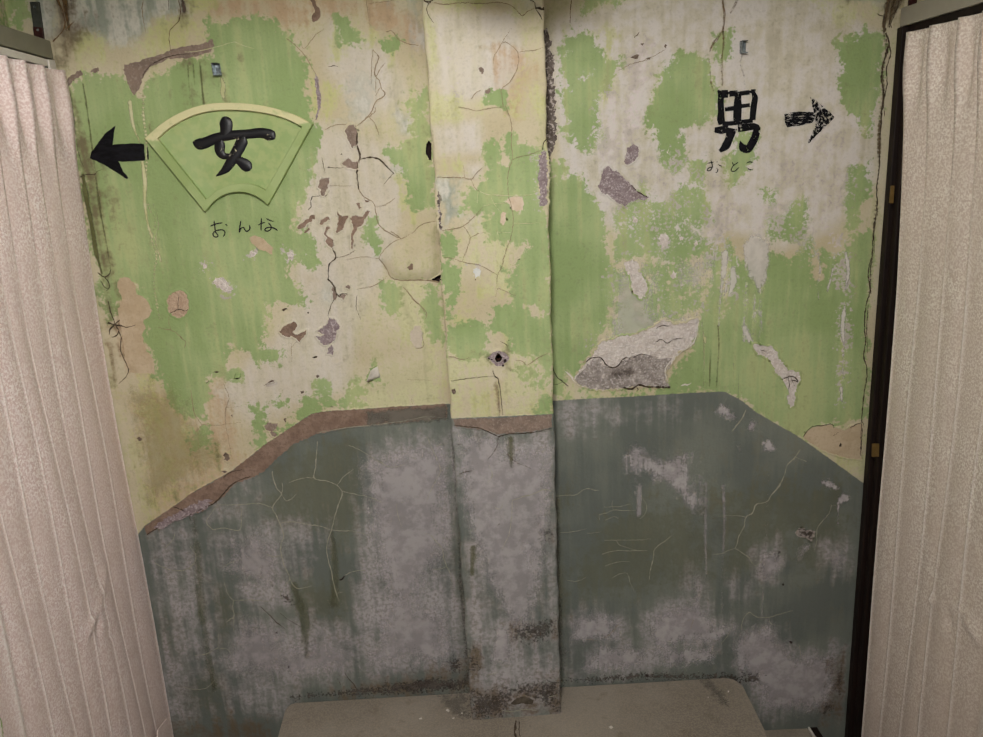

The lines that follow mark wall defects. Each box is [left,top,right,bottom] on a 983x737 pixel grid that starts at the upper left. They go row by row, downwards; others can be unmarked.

water stain [81,174,109,274]
water stain [128,95,161,319]
peeling [295,198,372,251]
peeling [340,122,361,172]
crack [308,0,547,348]
peeling [277,308,342,358]
crack [502,319,699,391]
flaking render [572,316,701,393]
crack [717,0,900,566]
water stain [367,406,447,426]
crack [174,356,550,656]
water stain [291,435,841,720]